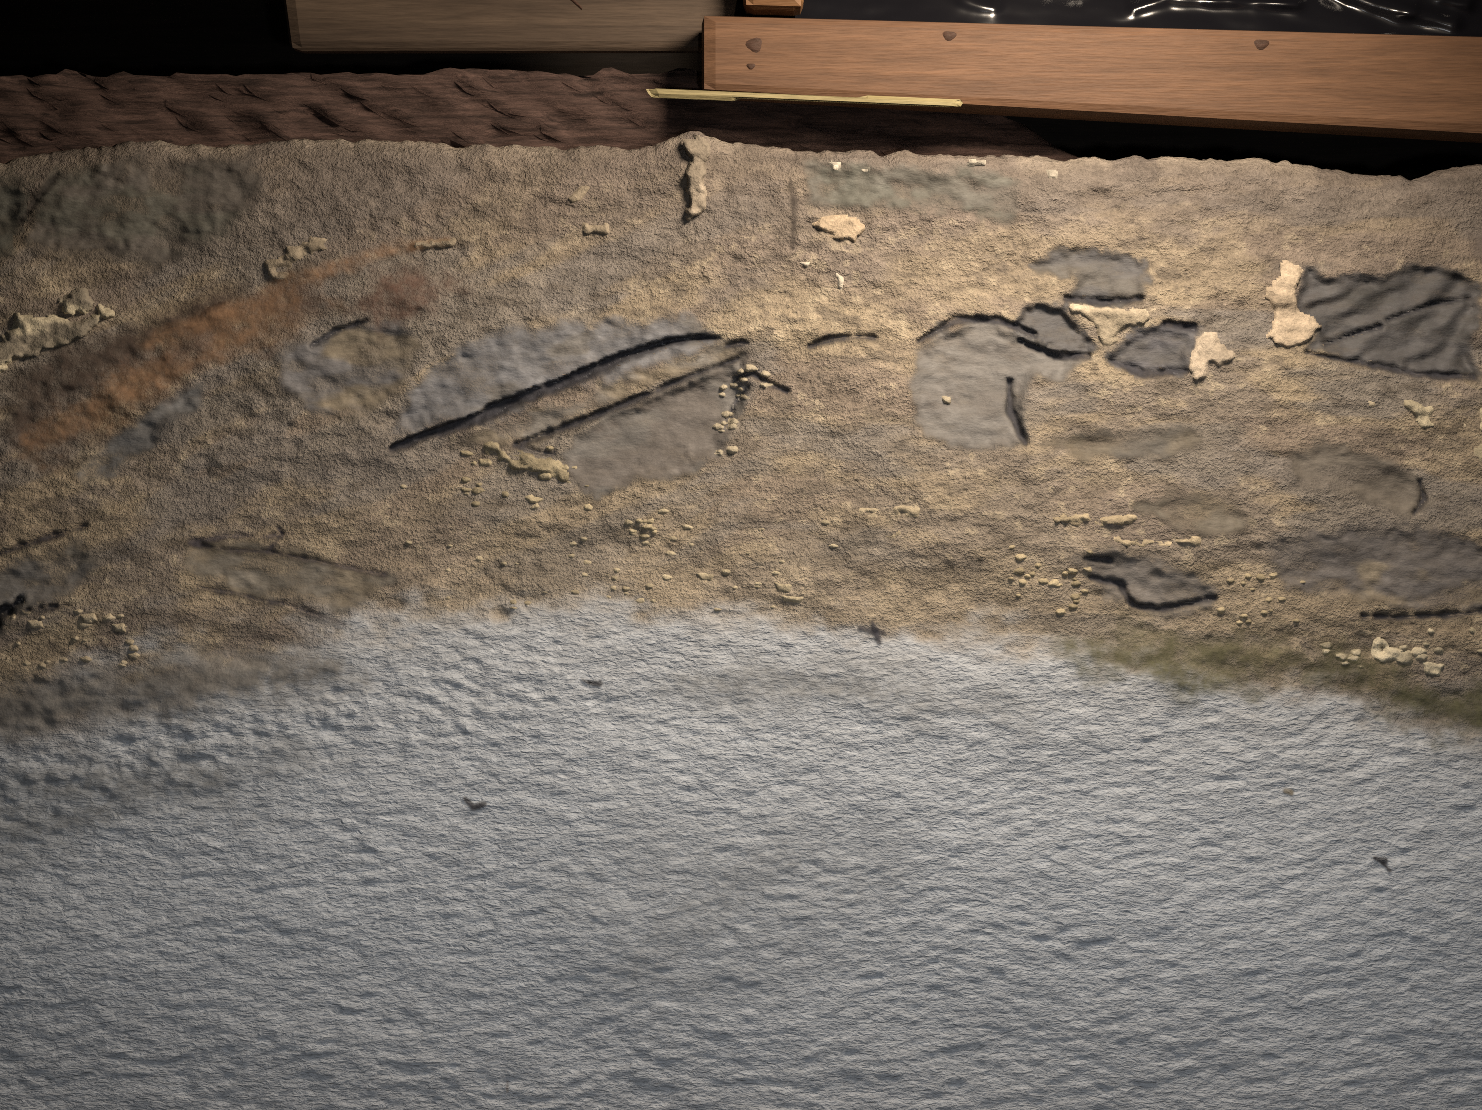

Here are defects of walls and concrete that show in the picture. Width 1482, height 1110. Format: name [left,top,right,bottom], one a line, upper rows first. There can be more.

spalling [807,159,1015,220]
spalling [911,246,1197,448]
spalling [1297,265,1481,380]
spalling [282,317,788,511]
peeling [1404,400,1434,428]
peeling [1464,408,1482,461]
flaking render [624,509,694,556]
spalling [1133,495,1244,533]
flaking render [697,560,803,608]
spalling [1008,545,1287,625]
peeling [858,621,886,643]
flaking render [1320,628,1444,676]